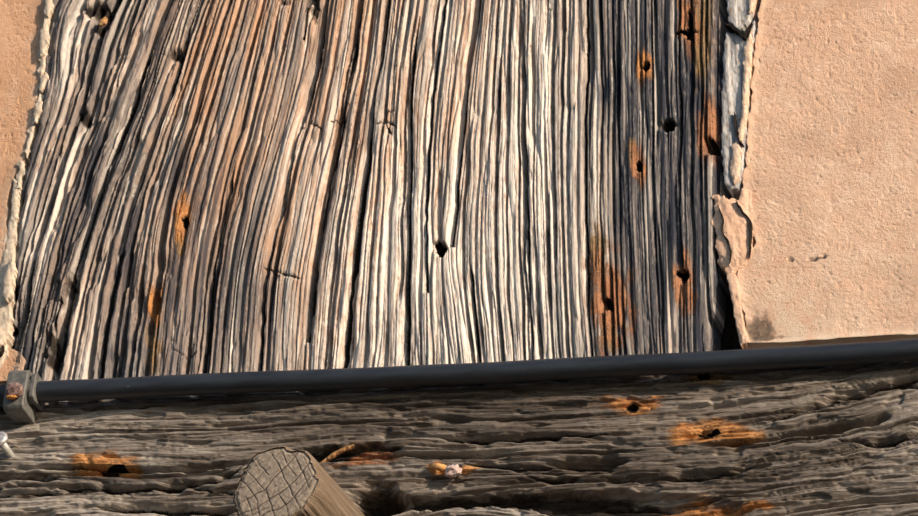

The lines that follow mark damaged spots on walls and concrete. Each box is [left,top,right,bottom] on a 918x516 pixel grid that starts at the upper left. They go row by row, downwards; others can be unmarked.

peeling [748,0,759,16]
rust [636,52,653,84]
rust [628,140,647,189]
peeling [711,29,756,276]
peeling [0,0,55,369]
rust [589,223,635,352]
rust [672,250,696,311]
rust [604,396,659,415]
rust [669,418,764,447]
rust [71,451,142,479]
rust [327,451,396,467]
rust [673,500,774,516]